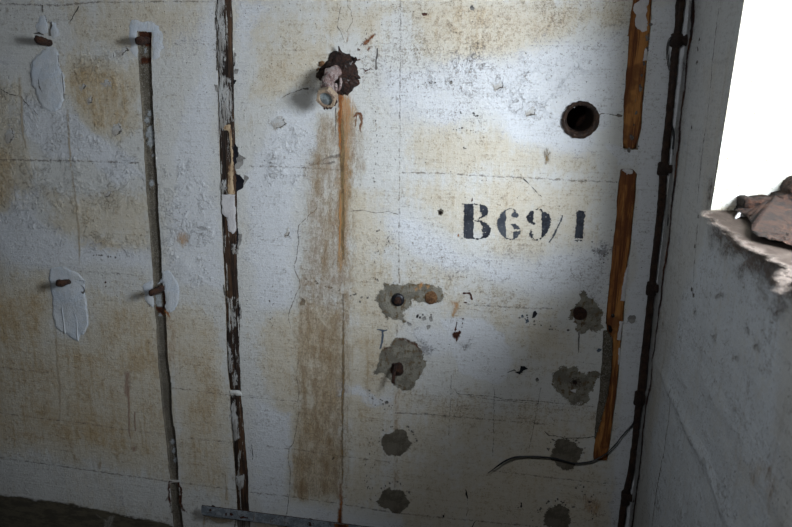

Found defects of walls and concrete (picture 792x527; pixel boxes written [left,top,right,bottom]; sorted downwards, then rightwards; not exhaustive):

corrosion [316,34,376,269]
corrosion [202,296,369,527]